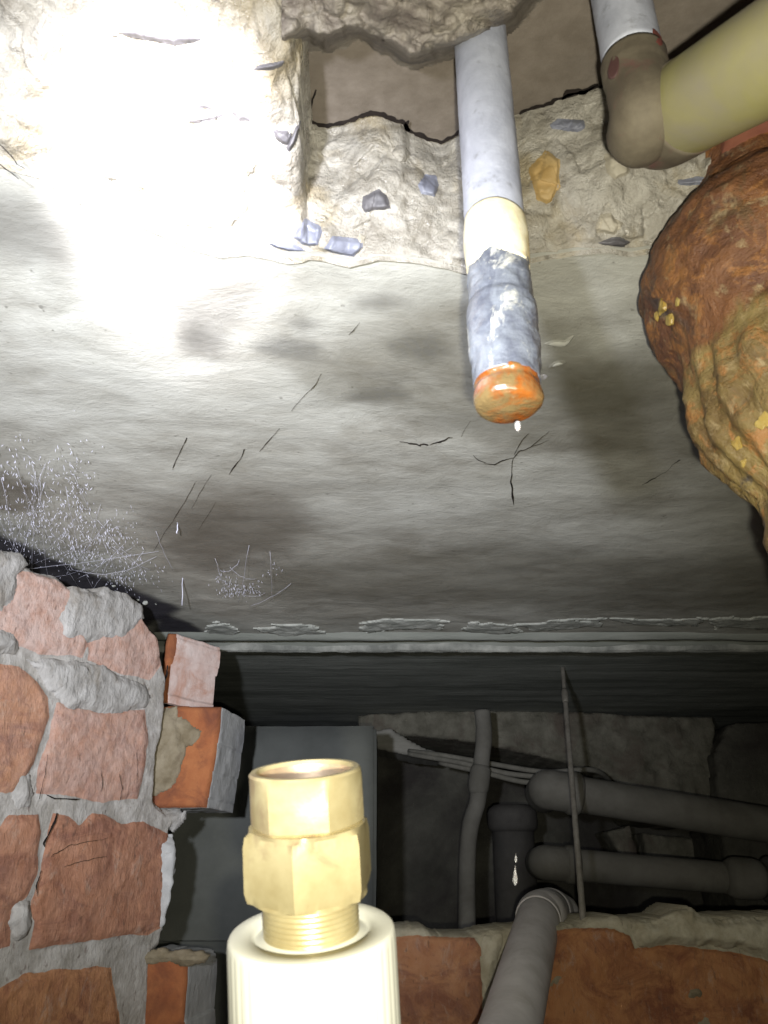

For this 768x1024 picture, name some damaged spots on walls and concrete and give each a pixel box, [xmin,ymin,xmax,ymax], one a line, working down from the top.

spalling [0,0,545,275]
crack [311,90,459,144]
crack [519,84,603,115]
spalling [514,88,711,264]
crack [400,422,548,505]